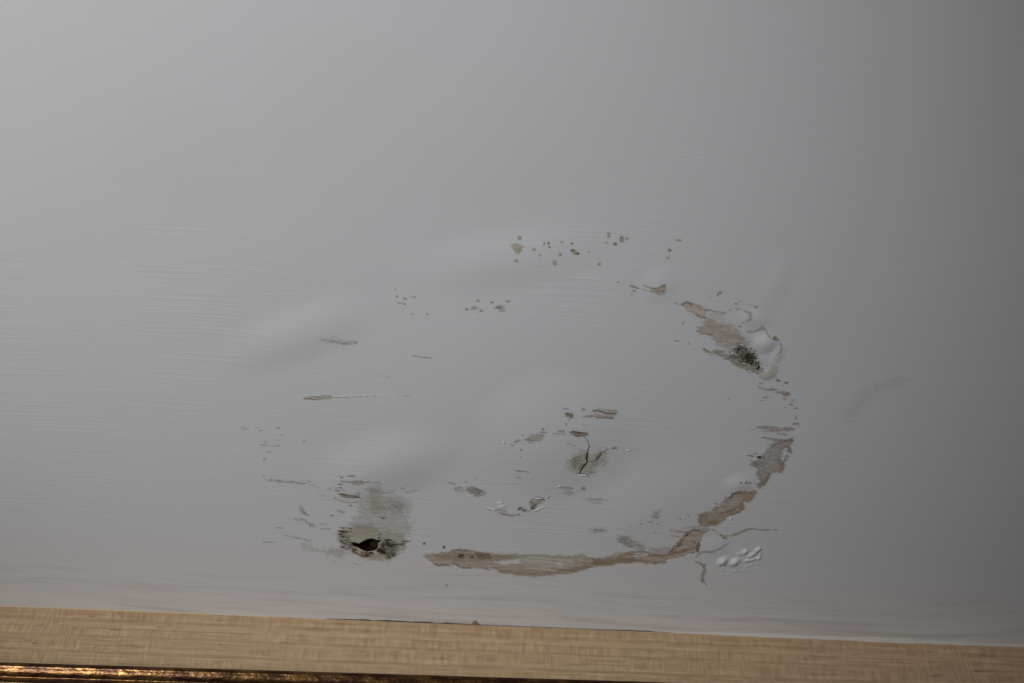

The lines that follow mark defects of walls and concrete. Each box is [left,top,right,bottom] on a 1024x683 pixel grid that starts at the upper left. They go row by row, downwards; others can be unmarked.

water stain [676,302,797,409]
peeling [487,485,563,516]
water stain [338,423,798,583]
crack [578,437,630,477]